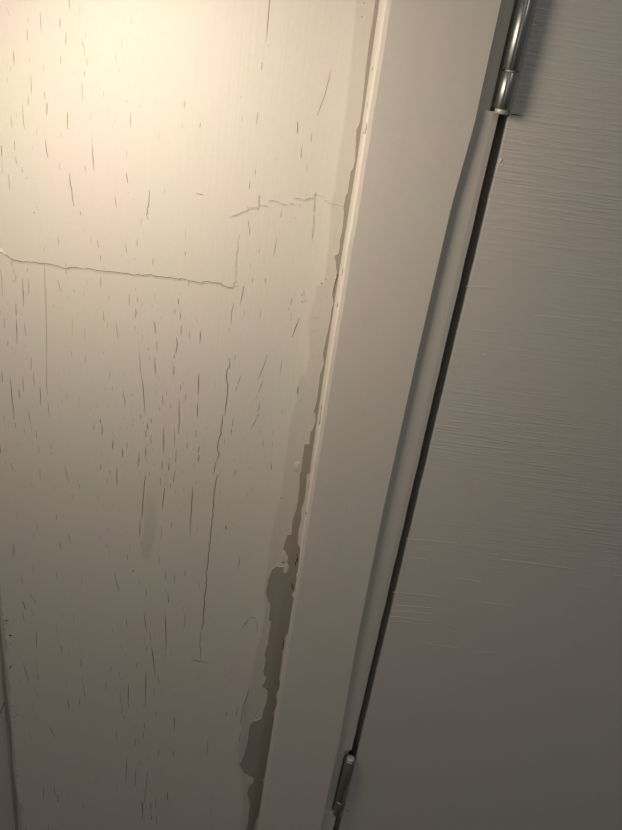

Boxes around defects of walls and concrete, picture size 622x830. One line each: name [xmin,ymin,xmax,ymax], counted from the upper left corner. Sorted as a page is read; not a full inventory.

crack [1,3,104,215]
crack [0,169,344,824]
peeling [237,0,379,830]